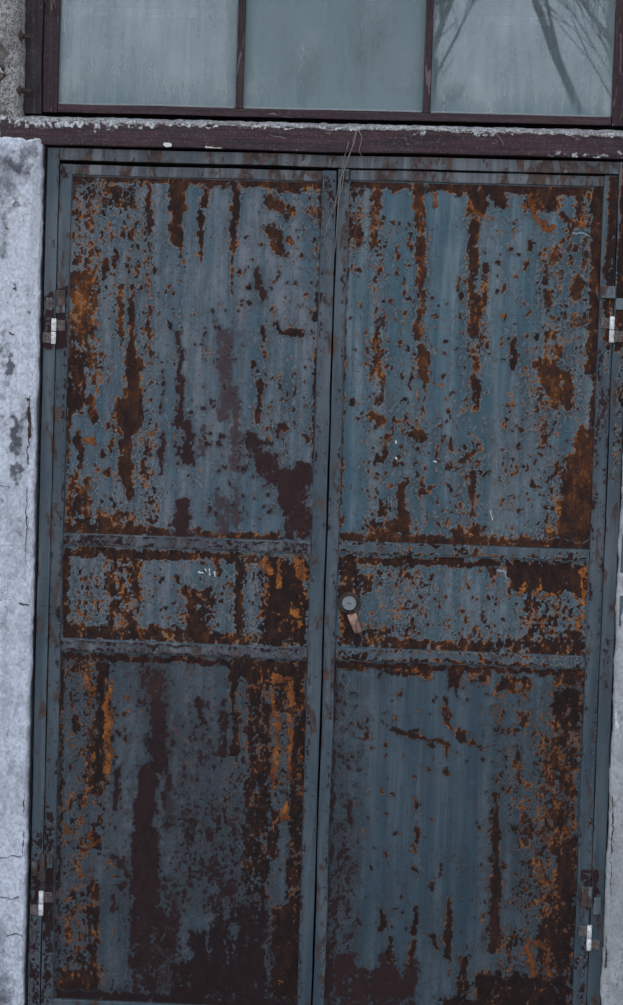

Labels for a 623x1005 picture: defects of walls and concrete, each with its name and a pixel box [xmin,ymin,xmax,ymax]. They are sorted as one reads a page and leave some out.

corrosion [28,165,623,1005]